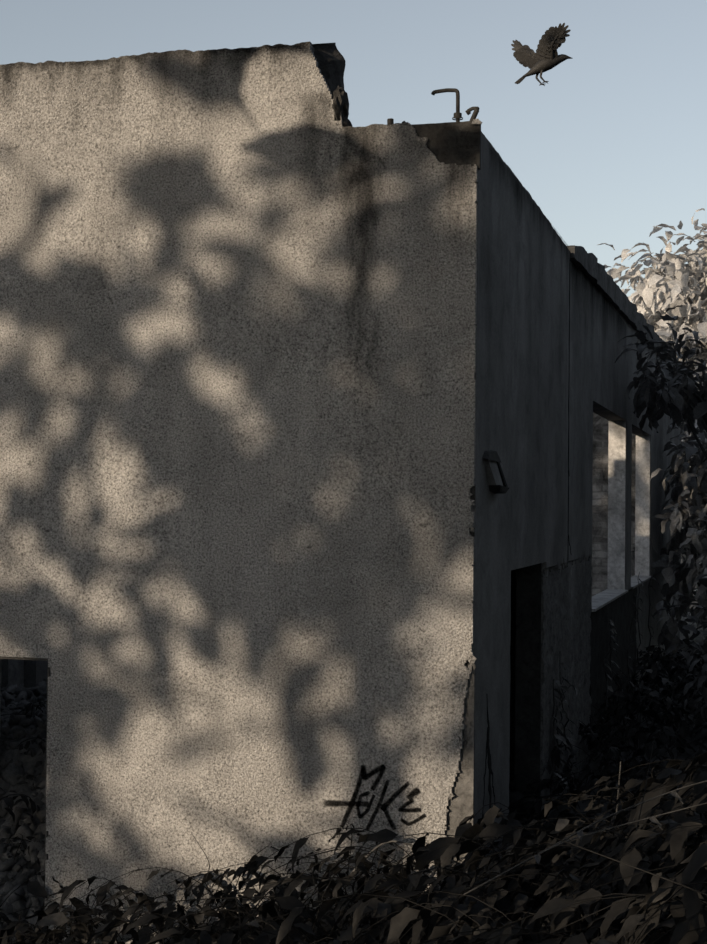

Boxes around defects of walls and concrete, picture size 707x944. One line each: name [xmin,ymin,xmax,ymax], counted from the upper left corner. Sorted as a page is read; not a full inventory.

leakage [2,59,109,78]
leakage [204,41,310,55]
spalling [312,43,352,127]
spalling [412,88,482,170]
spalling [445,654,477,837]